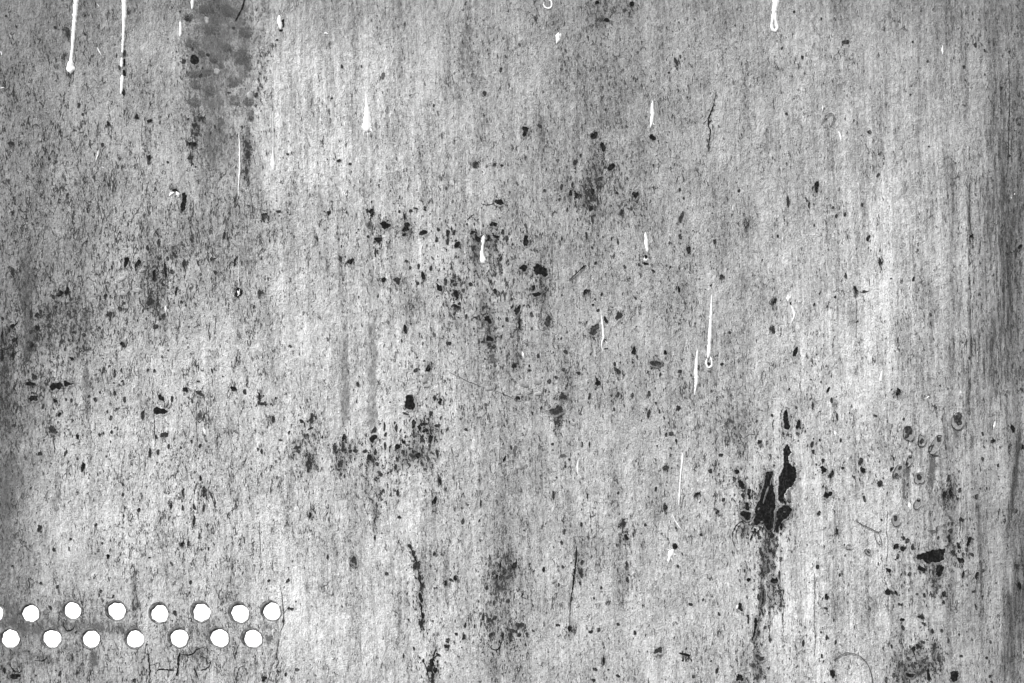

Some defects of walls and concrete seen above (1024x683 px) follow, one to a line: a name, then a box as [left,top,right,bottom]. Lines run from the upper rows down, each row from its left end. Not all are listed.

water stain [172,0,276,186]
crack [703,87,717,150]
water stain [735,525,791,683]